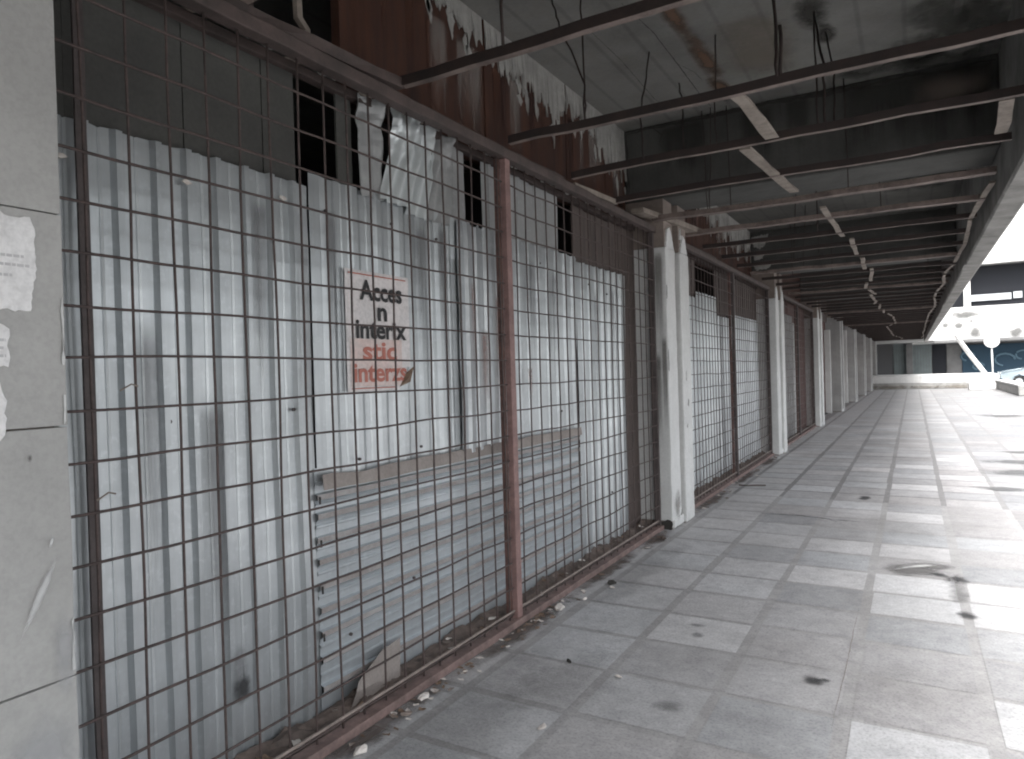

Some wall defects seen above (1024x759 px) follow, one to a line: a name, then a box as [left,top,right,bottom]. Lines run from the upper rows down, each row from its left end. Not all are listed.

peeling [425,0,511,55]
corrosion [528,84,573,158]
peeling [486,54,627,195]